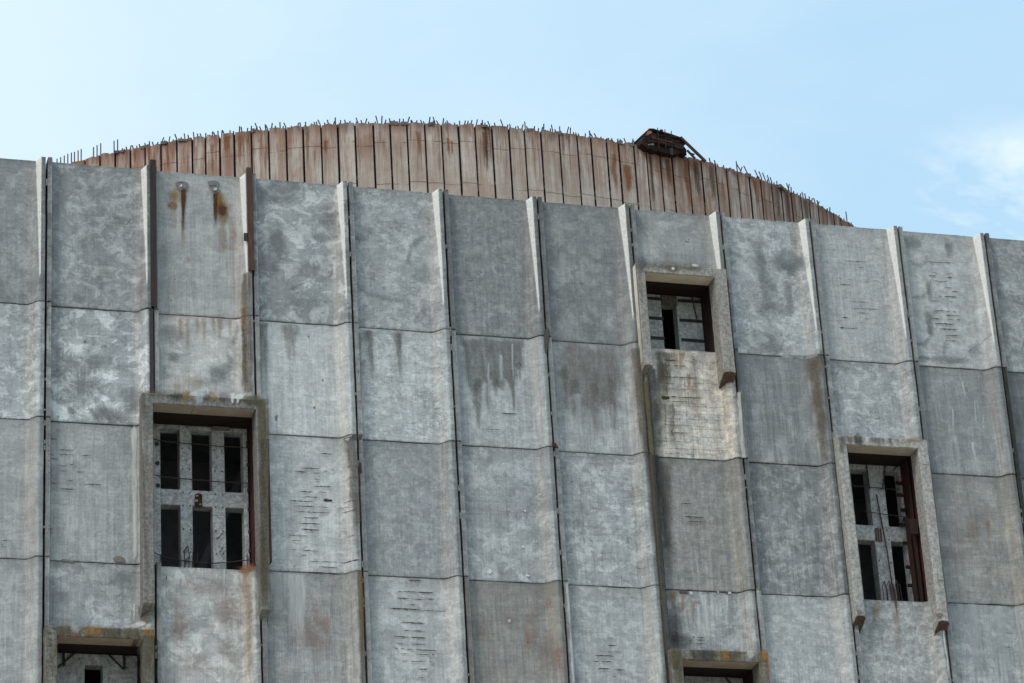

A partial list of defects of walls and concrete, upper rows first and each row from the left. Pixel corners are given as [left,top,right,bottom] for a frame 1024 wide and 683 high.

corrosion [168,189,186,227]
corrosion [213,194,227,220]
leakage [458,339,521,415]
efflorescence [738,393,746,457]